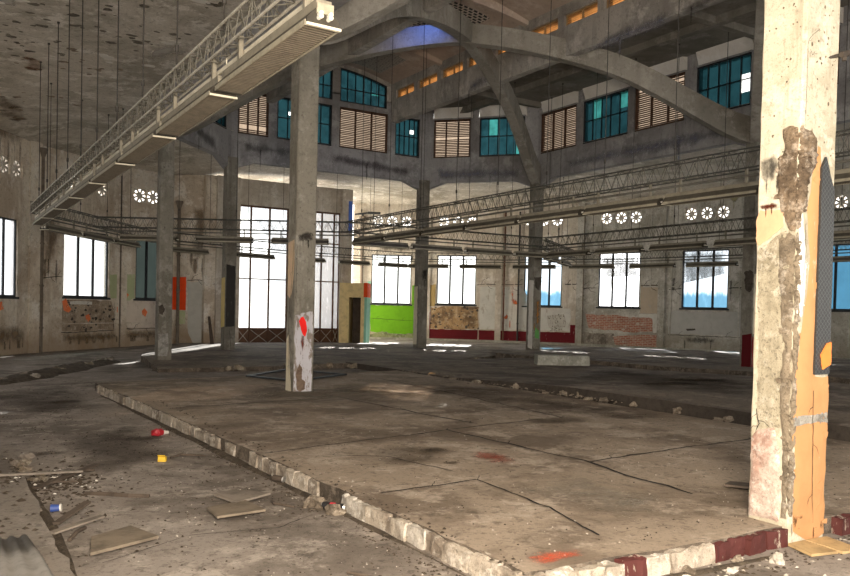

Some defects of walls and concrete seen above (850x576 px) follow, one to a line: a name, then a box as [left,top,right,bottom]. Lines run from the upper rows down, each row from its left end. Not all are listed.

peeling [285,311,313,392]
peeling [744,125,834,540]